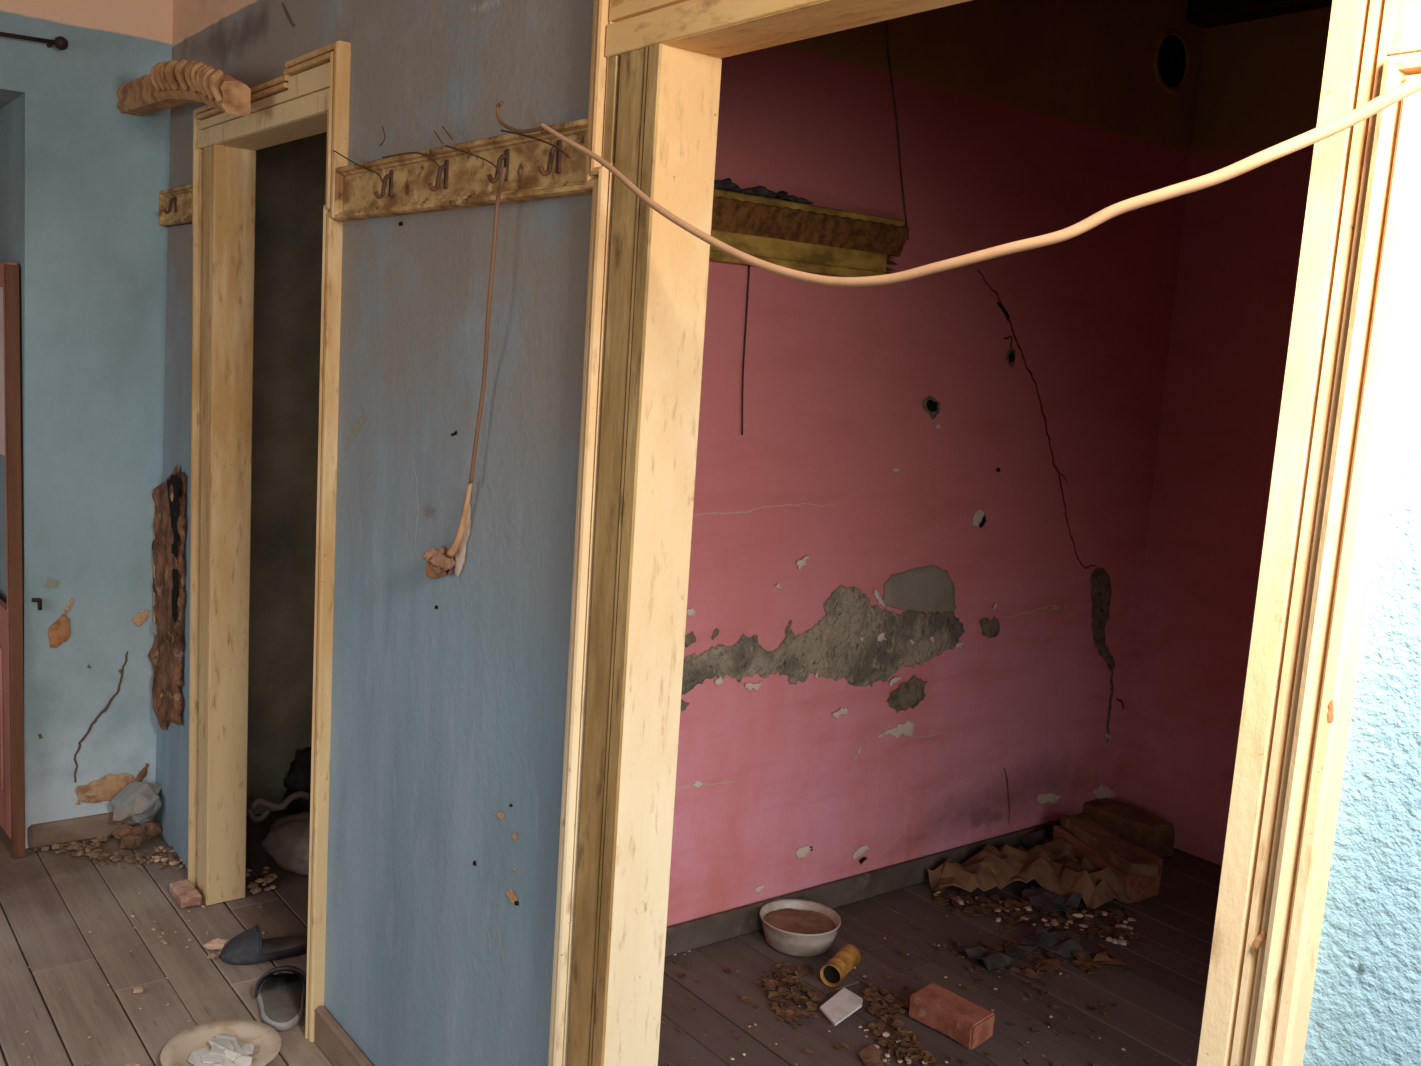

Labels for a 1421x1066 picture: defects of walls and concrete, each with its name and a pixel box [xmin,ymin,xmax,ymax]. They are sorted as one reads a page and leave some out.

spalling [922,396,941,429]
flaking render [48,598,75,648]
flaking render [132,465,186,730]
flaking render [681,565,1000,713]
crack [73,651,128,783]
flaking render [75,763,149,805]